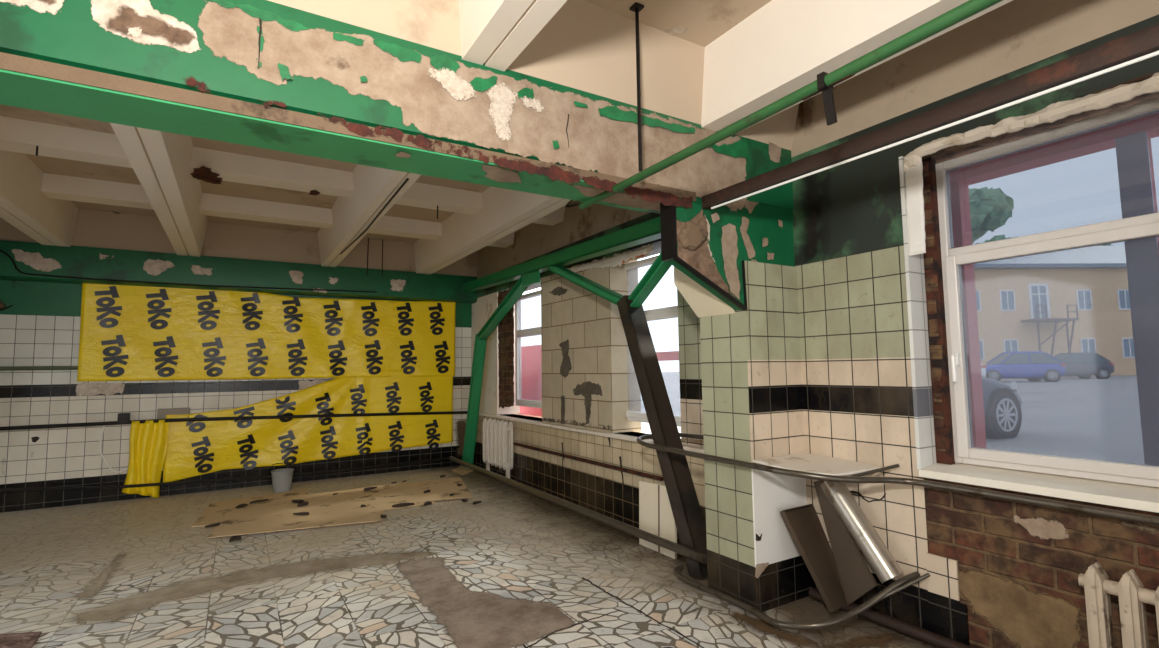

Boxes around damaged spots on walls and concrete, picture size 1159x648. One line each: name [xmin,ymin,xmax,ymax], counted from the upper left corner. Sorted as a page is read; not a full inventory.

peeling [0,0,64,15]
rust [186,77,210,93]
peeling [91,0,774,301]
rust [316,112,693,209]
peeling [769,142,781,163]
peeling [12,249,62,272]
peeling [1013,515,1069,540]
peeling [958,569,1082,648]